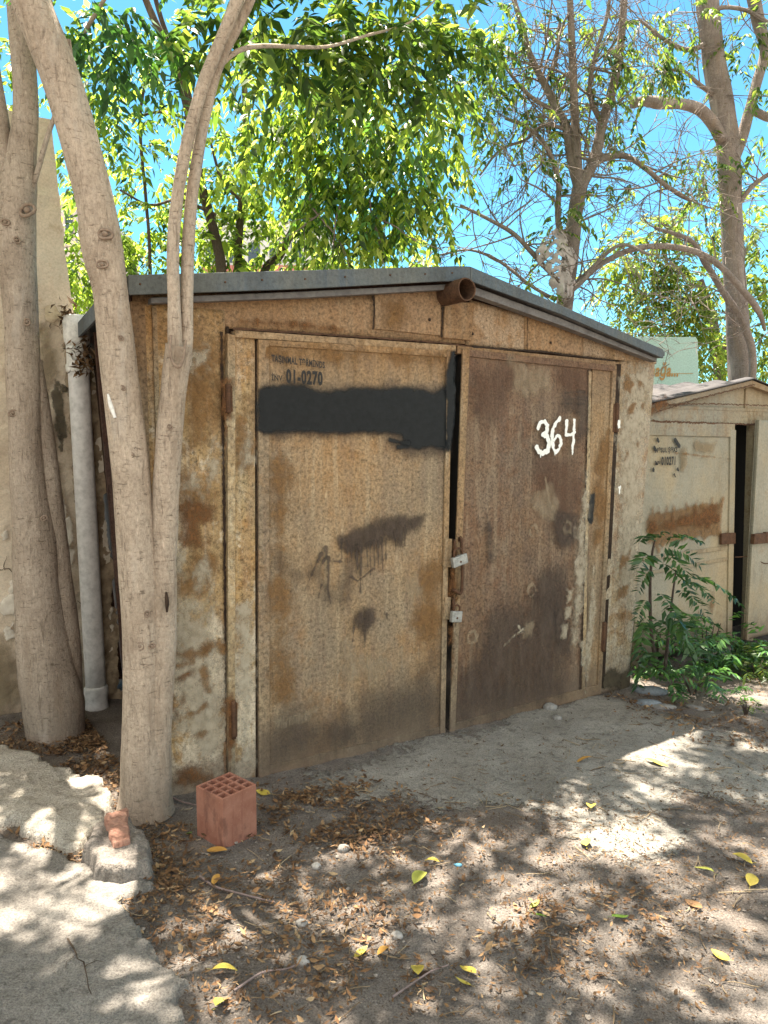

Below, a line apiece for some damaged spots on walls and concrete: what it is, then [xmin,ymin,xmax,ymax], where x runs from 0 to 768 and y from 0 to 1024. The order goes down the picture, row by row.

corrosion [186,341,255,469]
corrosion [179,474,217,595]
peeling [561,491,596,677]
corrosion [647,498,724,553]
corrosion [176,640,226,692]
corrosion [177,695,239,785]